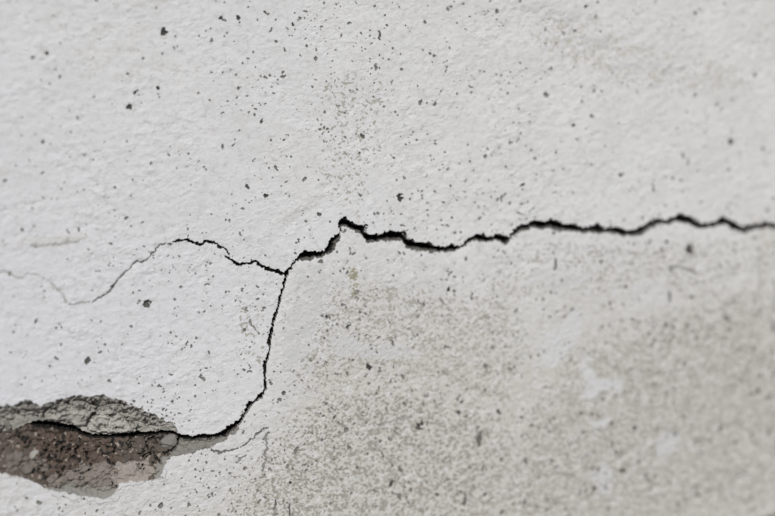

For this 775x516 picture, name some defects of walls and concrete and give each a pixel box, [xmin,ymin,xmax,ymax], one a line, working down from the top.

spalling [0,394,239,499]
crack [0,213,775,471]